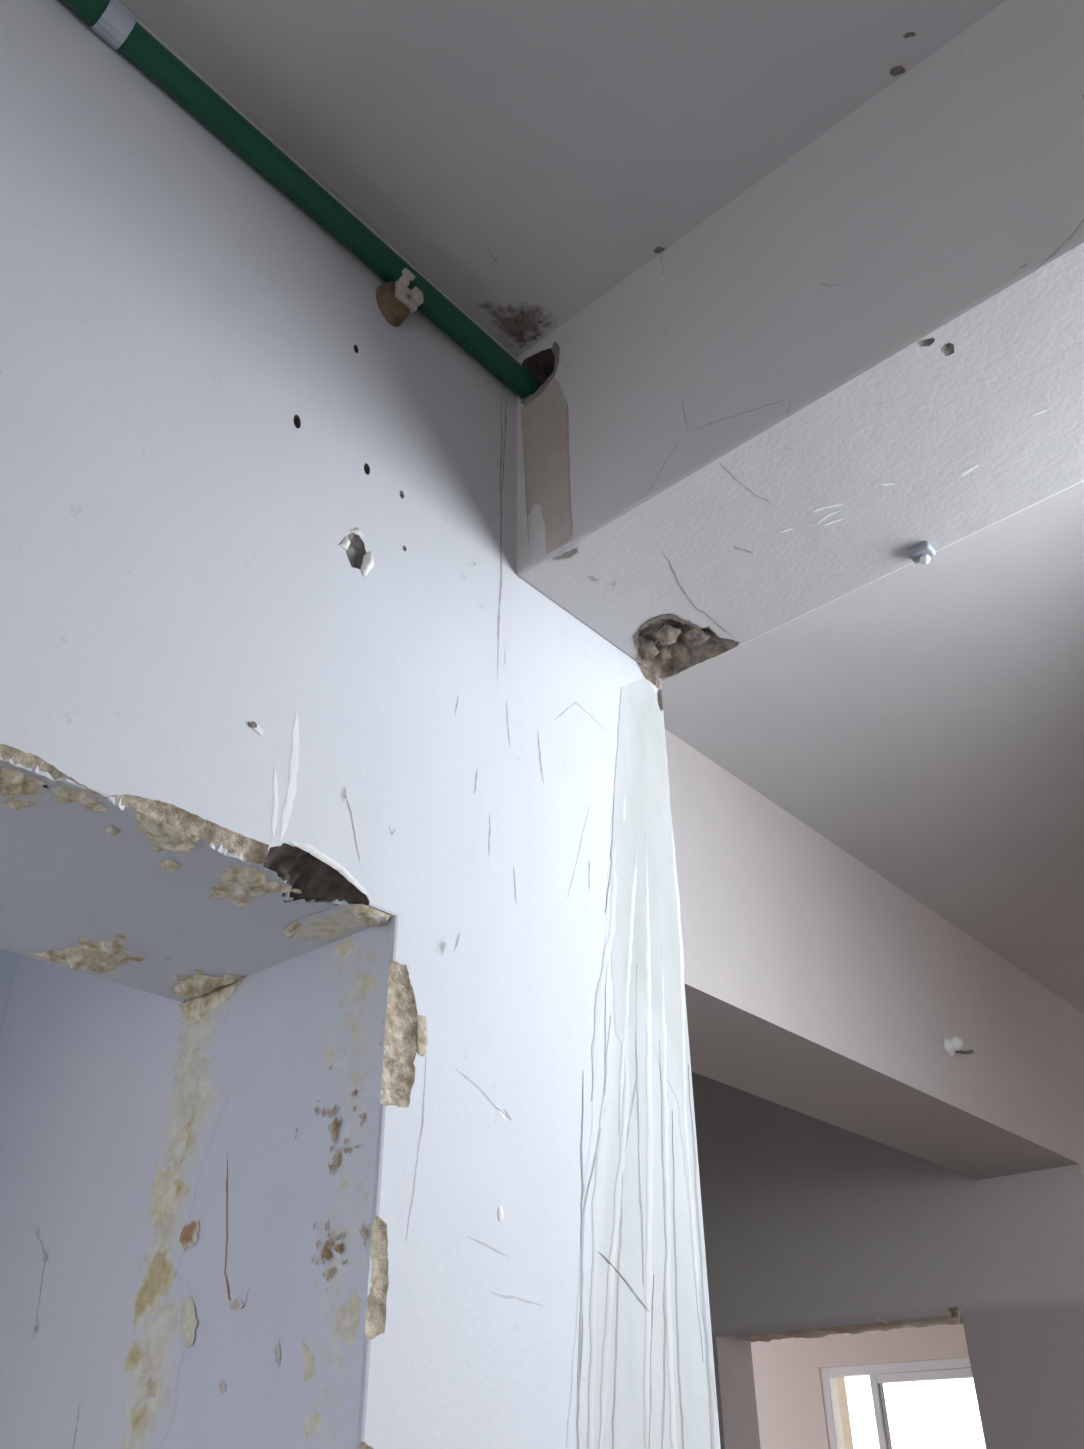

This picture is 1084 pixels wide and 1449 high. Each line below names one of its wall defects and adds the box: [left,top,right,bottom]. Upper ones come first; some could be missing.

spalling [0,743,371,905]